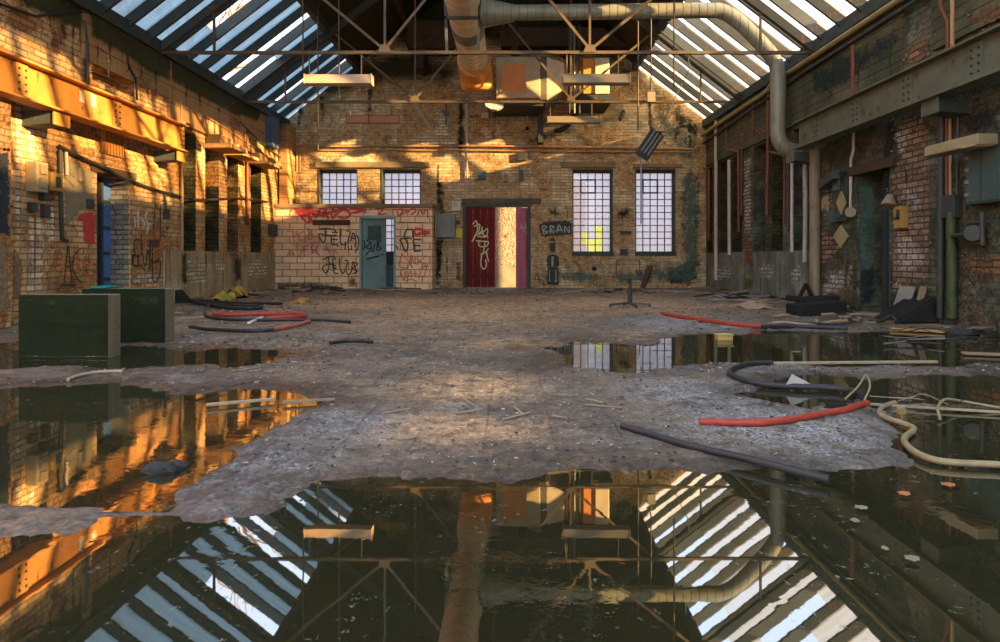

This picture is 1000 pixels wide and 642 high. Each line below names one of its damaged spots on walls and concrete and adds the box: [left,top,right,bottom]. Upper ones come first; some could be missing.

water stain [813,29,897,96]